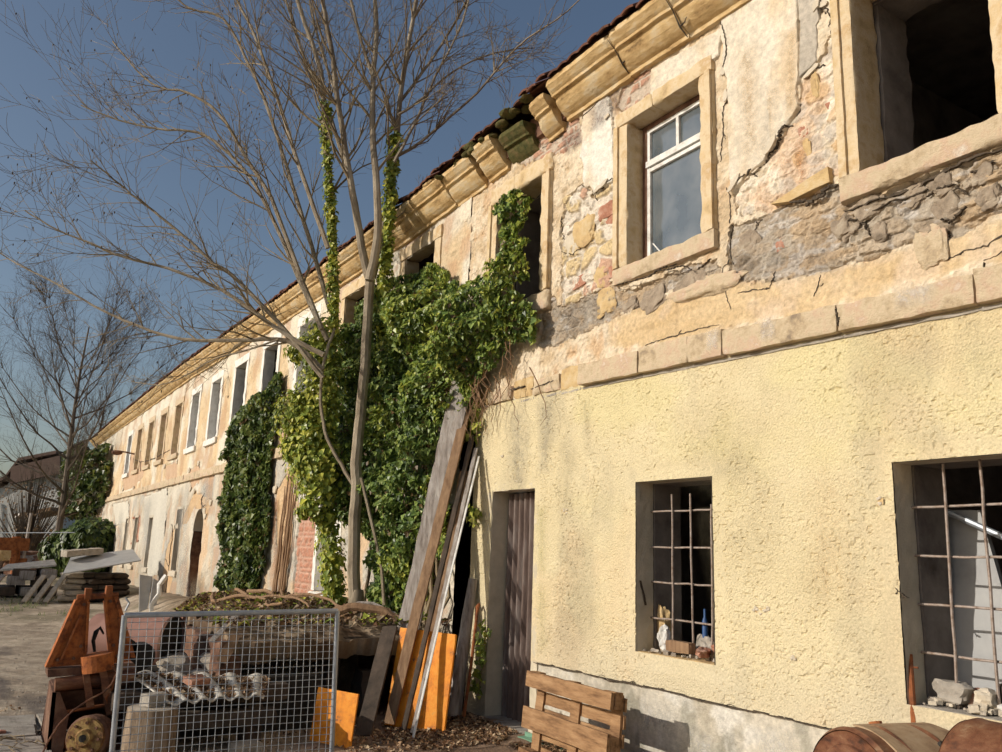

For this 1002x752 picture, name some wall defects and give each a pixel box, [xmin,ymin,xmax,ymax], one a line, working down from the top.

crack [719,21,727,76]
crack [616,101,802,346]
spalling [521,0,1002,347]
crack [789,149,1002,267]